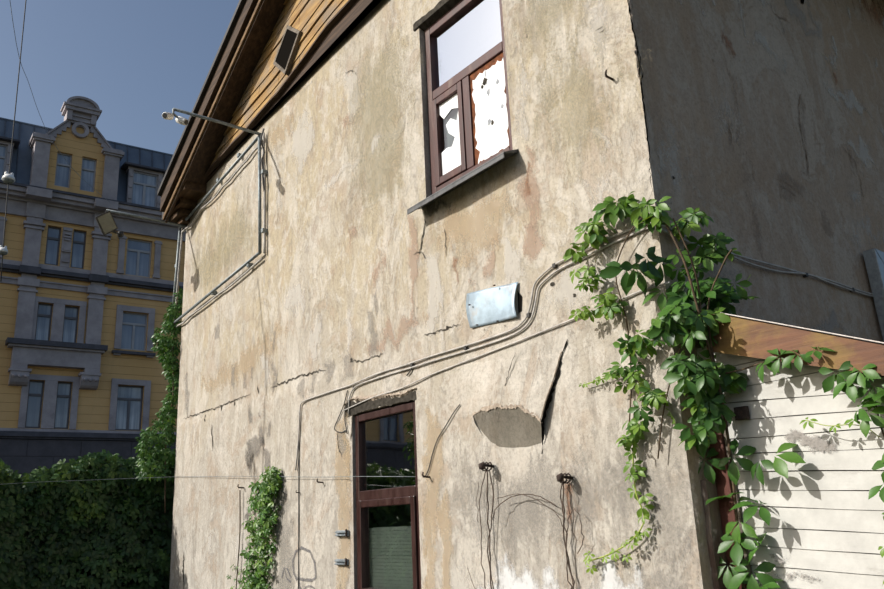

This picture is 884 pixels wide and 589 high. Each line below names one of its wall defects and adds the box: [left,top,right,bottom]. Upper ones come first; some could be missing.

crack [627,0,653,190]
crack [186,369,325,452]
crack [540,341,567,454]